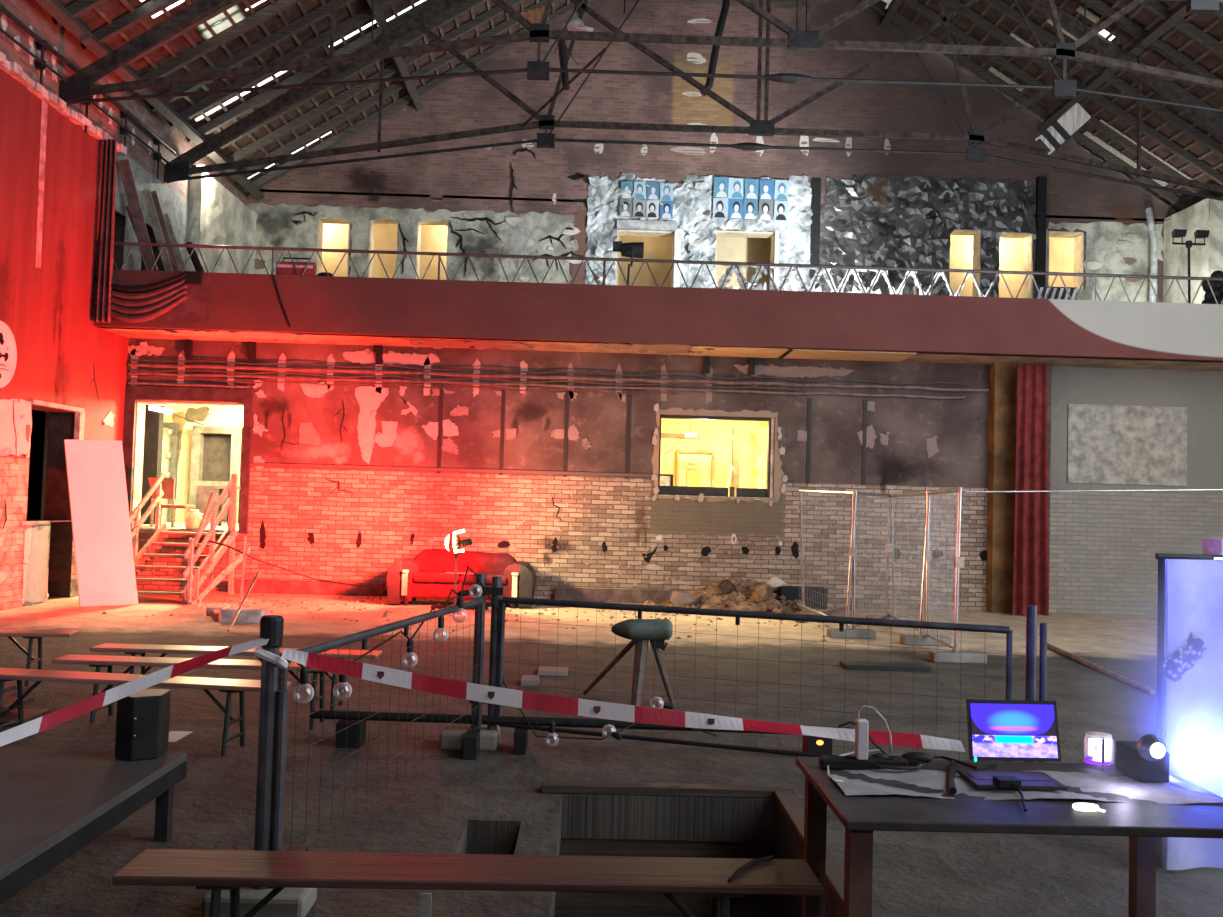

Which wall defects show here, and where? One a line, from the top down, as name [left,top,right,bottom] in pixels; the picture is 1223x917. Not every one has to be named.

crack [450,147,536,277]
crack [533,234,584,270]
peeling [252,379,266,398]
peeling [300,382,331,398]
peeling [0,398,32,458]
peeling [253,414,268,437]
peeling [299,421,325,446]
peeling [355,386,469,464]
peeling [492,428,517,440]
peeling [550,424,592,449]
flaking render [651,403,807,506]